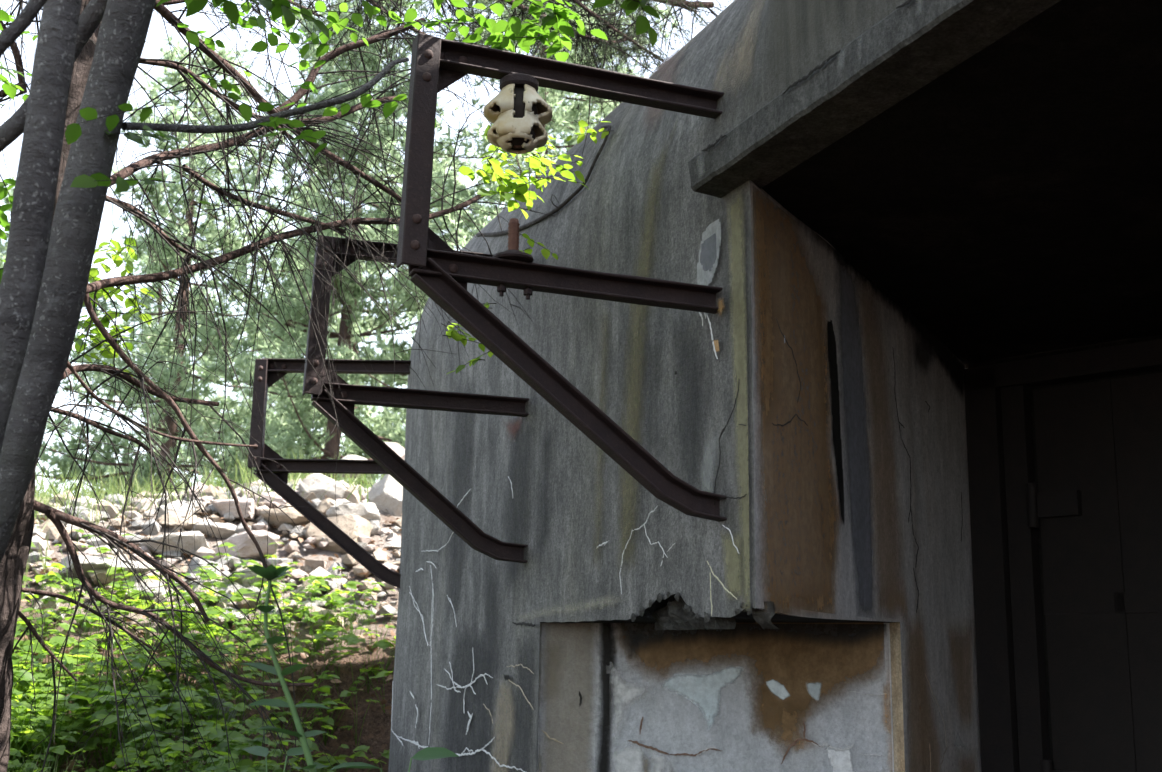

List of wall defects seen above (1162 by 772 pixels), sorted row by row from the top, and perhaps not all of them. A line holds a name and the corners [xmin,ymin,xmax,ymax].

crack [596,506,675,594]
crack [391,489,563,772]
spalling [630,592,779,630]
peeling [665,668,741,726]
peeling [767,680,789,699]
peeling [808,683,820,700]